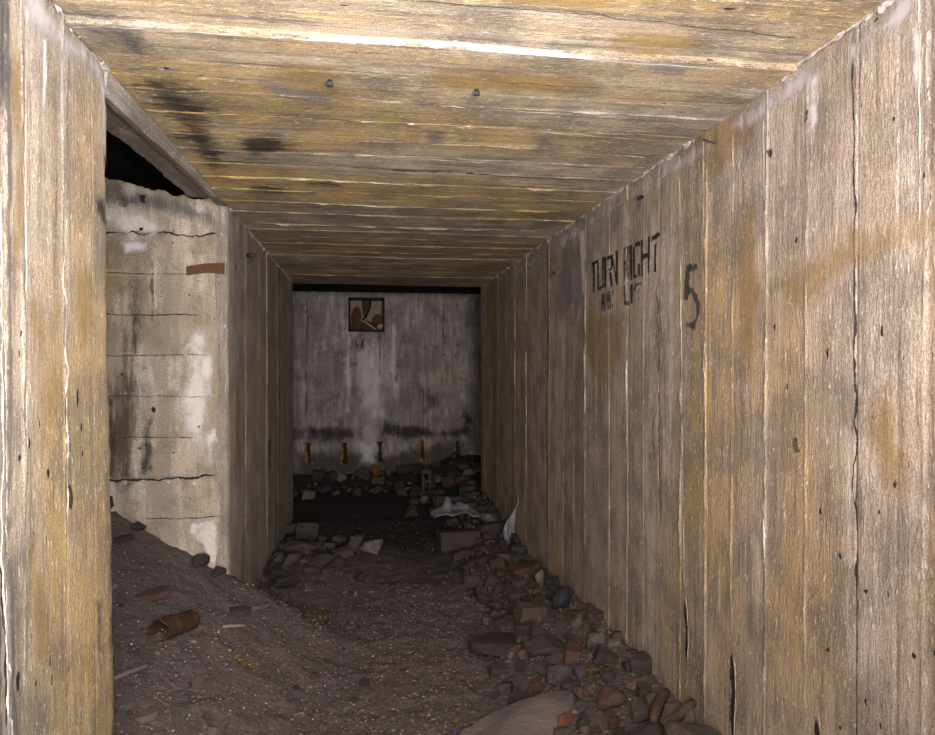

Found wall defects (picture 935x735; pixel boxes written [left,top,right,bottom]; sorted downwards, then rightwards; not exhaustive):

water stain [134,81,220,167]
water stain [241,138,289,154]
crack [106,230,216,238]
water stain [109,351,136,480]
water stain [293,324,471,475]
water stain [142,434,152,473]
crack [110,474,216,485]